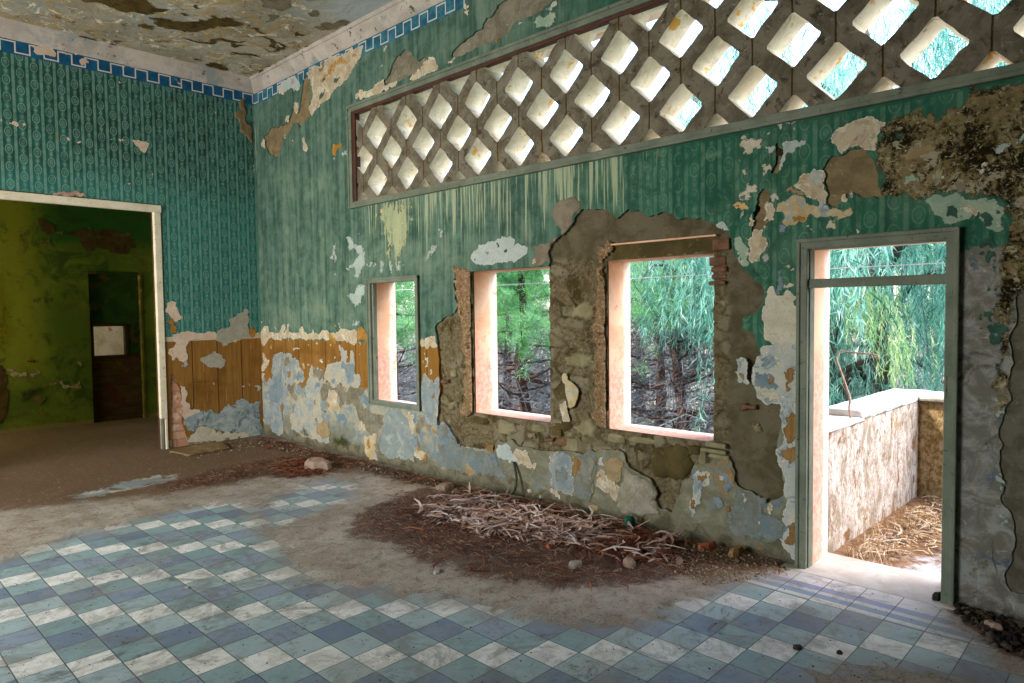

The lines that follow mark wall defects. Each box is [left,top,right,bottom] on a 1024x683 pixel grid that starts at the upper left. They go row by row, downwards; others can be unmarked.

peeling [234,45,363,157]
spalling [355,0,557,100]
peeling [924,192,1005,269]
spalling [165,116,885,560]
spalling [978,292,1024,594]